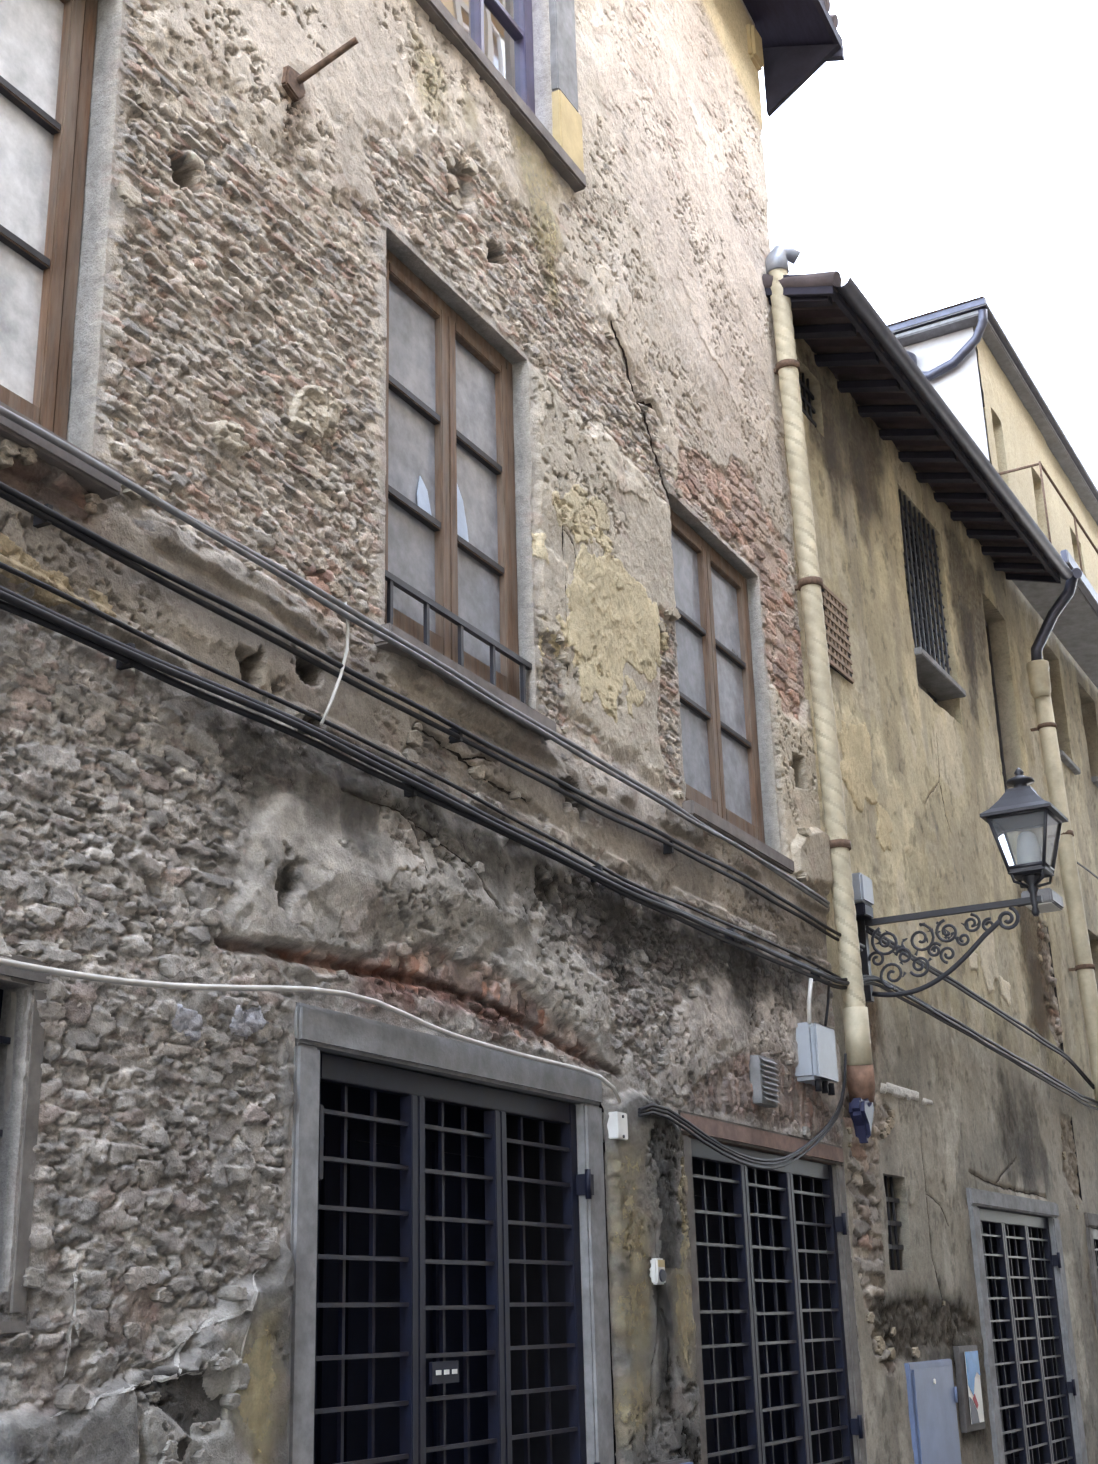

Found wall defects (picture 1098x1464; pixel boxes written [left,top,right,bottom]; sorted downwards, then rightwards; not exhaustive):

crack [610,320,669,499]
flaking render [532,484,685,799]
flaking render [674,443,805,723]
flaking render [122,1266,172,1342]
flaking render [130,1348,251,1464]
flaking render [874,1292,977,1362]